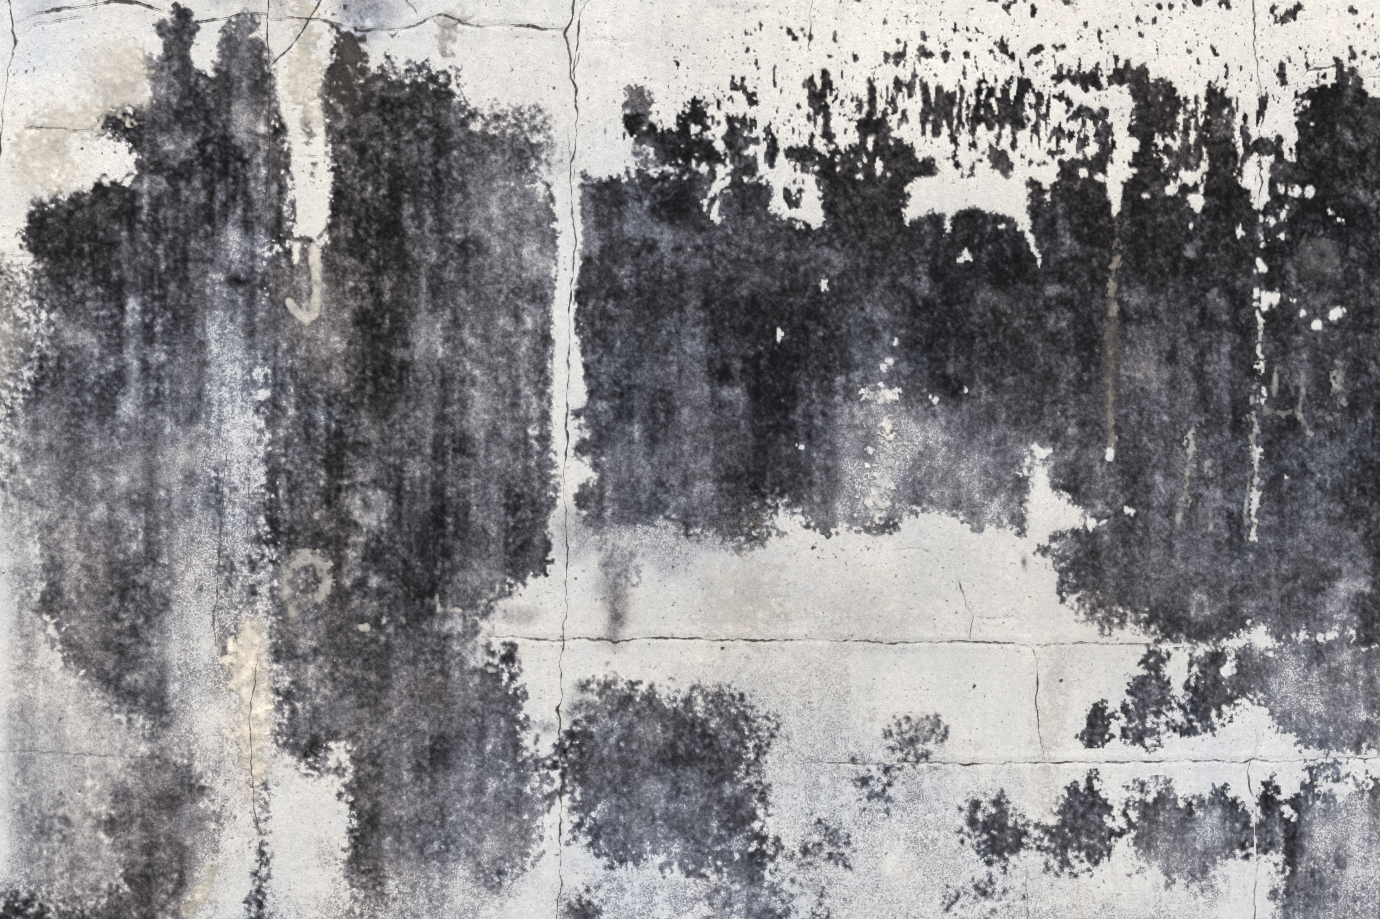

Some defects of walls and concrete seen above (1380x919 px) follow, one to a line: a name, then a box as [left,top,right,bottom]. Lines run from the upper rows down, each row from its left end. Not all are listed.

crack [0,0,163,153]
damp [302,114,316,145]
damp [343,0,386,24]
crack [1253,0,1265,203]
crack [1302,64,1376,77]
crack [195,0,586,475]
damp [570,153,1380,763]
damp [9,695,40,751]
crack [249,659,262,877]
crack [482,488,1376,919]
damp [237,771,286,919]
damp [971,899,1062,919]